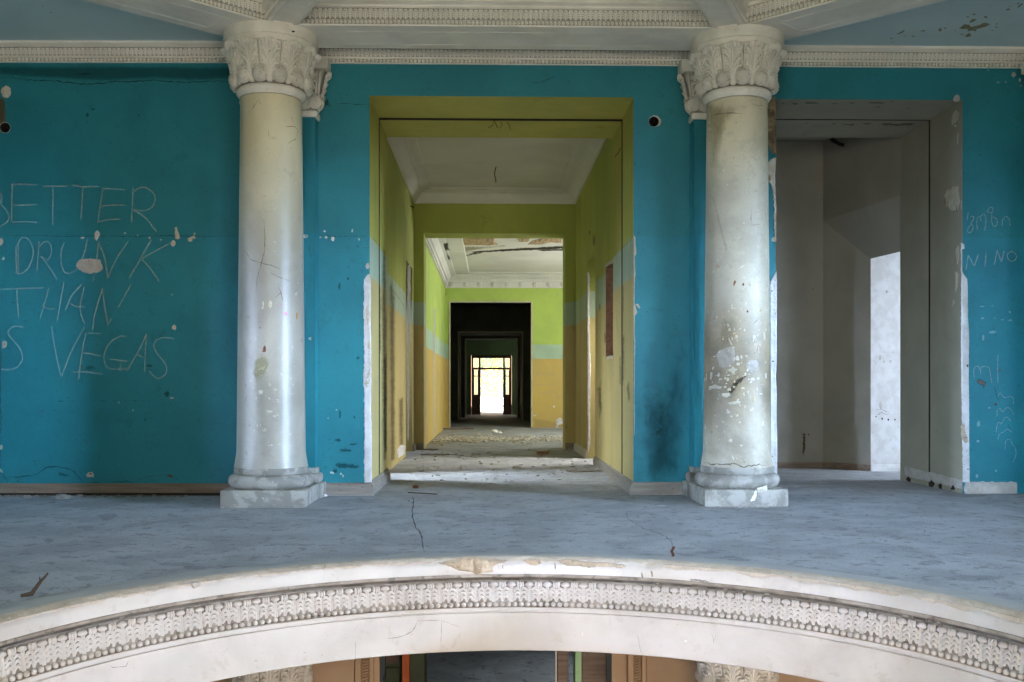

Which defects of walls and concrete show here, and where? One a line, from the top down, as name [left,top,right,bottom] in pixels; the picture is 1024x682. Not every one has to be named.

peeling [938,14,997,37]
flaking render [704,268,777,474]
crack [405,497,436,552]
flaking render [0,556,507,625]